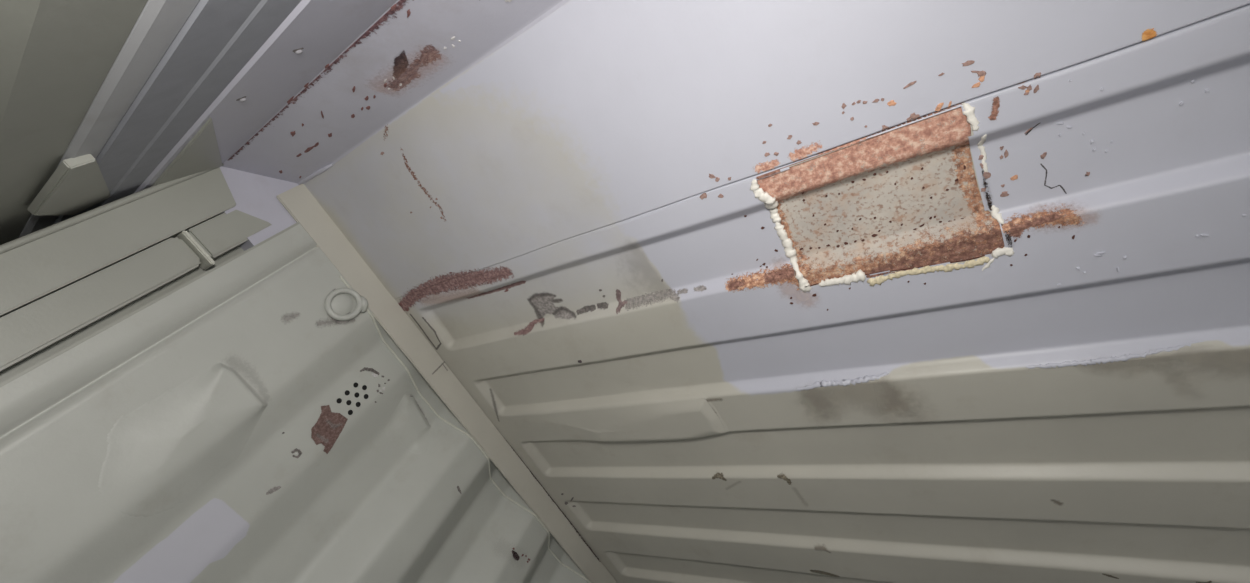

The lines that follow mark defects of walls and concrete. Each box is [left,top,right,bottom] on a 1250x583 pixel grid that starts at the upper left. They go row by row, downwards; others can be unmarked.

corrosion [228,0,411,160]
corrosion [962,60,986,88]
corrosion [1018,72,1041,95]
corrosion [699,174,731,199]
corrosion [725,96,1085,304]
spalling [800,214,964,250]
corrosion [399,265,526,311]
peeling [514,279,707,336]